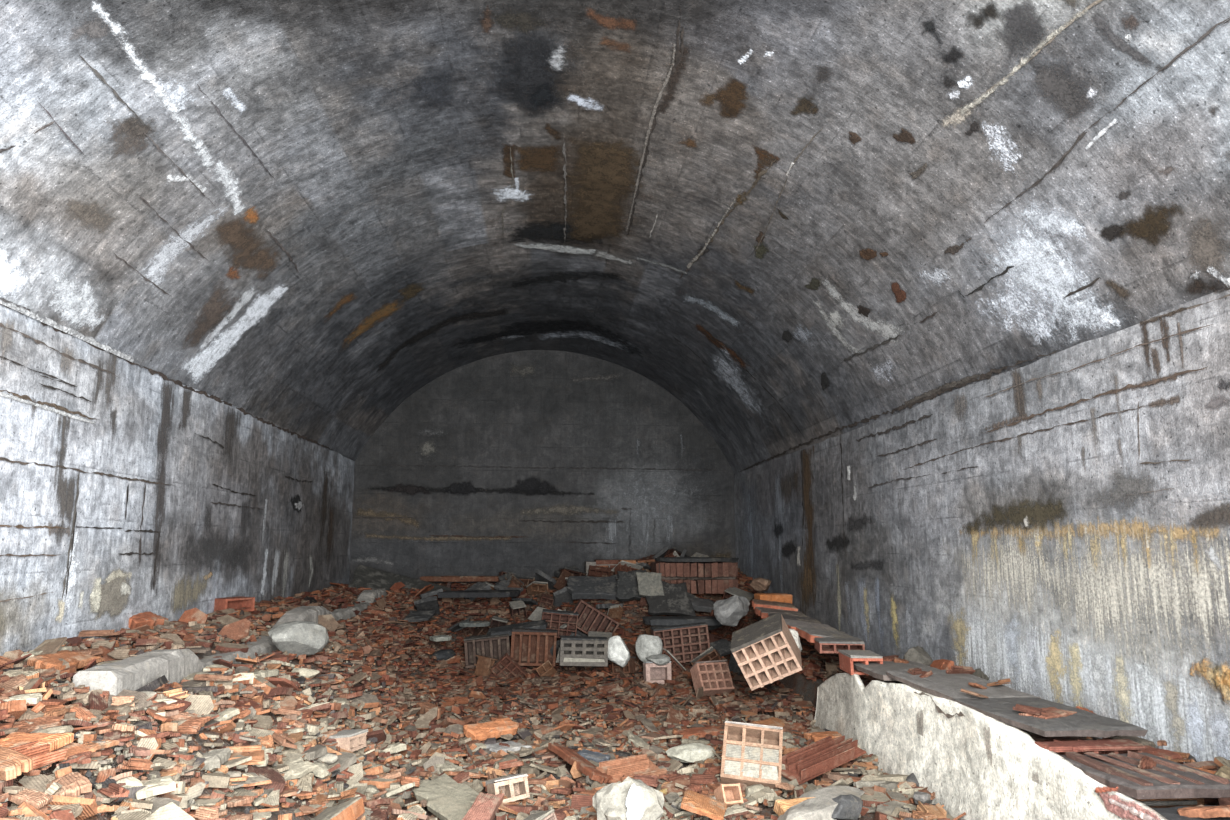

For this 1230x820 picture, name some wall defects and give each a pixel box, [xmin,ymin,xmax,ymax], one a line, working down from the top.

crack [0,102,84,155]
leakage [70,4,245,285]
leakage [569,95,602,110]
crack [986,17,1230,221]
crack [0,300,332,450]
crack [359,294,1230,546]
leakage [978,203,1121,341]
leakage [1140,307,1186,376]
leakage [54,416,102,622]
crack [0,457,174,602]
leakage [951,605,1230,765]
rust [959,519,1230,702]